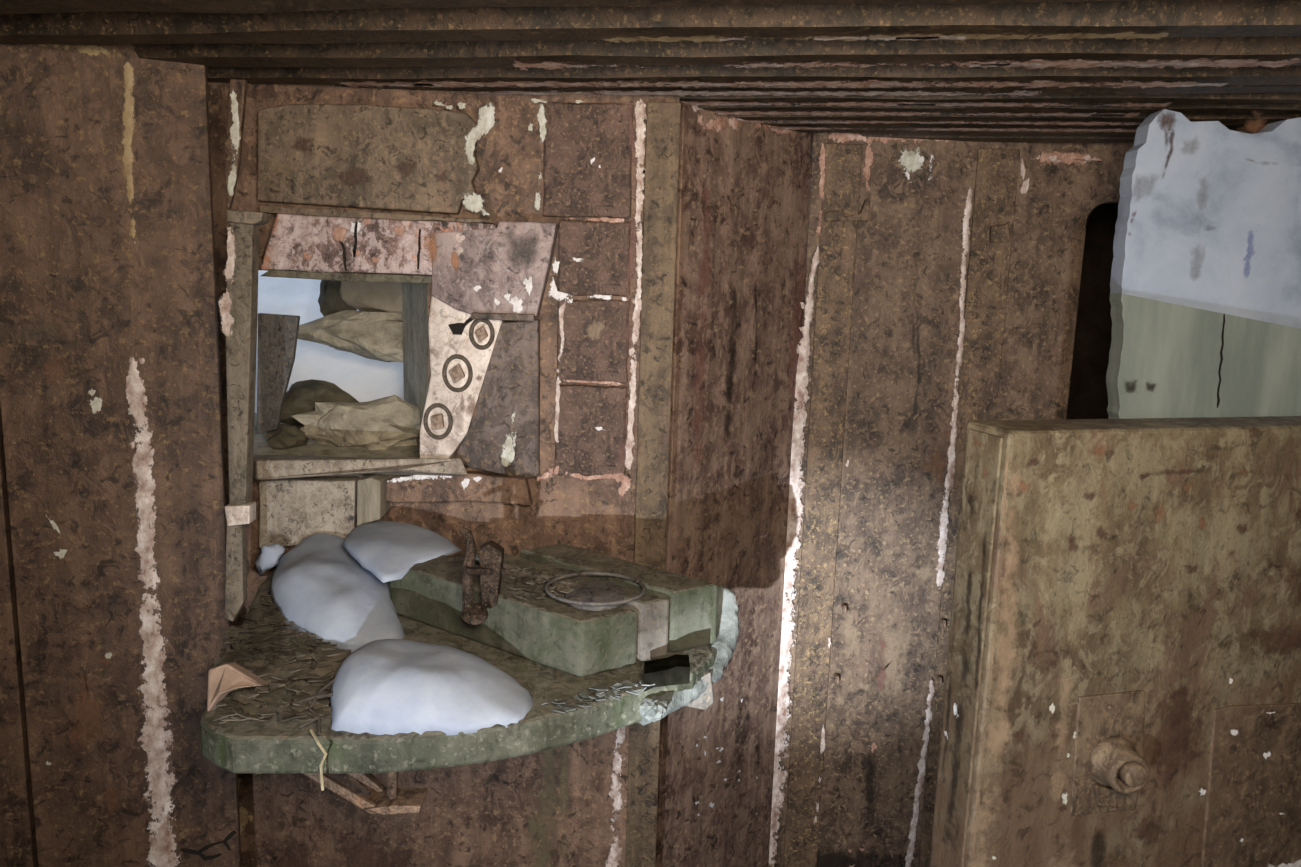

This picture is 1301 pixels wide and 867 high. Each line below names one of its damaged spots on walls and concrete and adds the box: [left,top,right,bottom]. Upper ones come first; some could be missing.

peeling [332,58,1301,867]